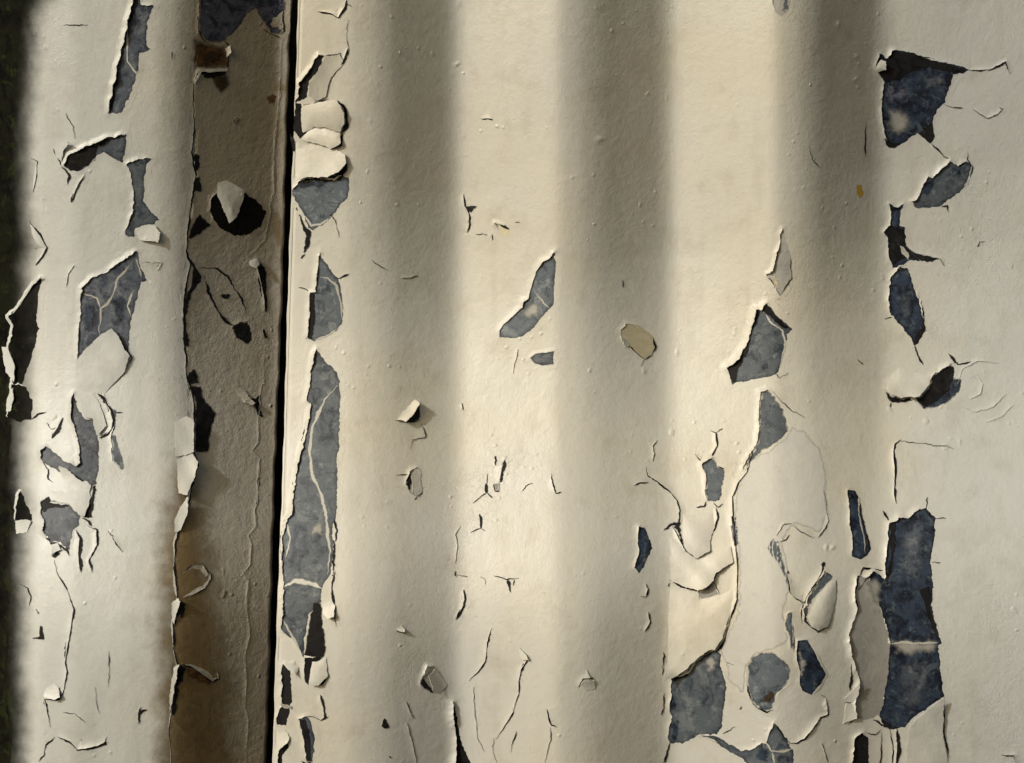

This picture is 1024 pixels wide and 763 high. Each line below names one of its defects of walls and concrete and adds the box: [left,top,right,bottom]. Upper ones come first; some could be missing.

peeling [2,0,165,558]
peeling [204,179,272,242]
peeling [272,47,355,763]
peeling [492,243,564,370]
peeling [616,319,660,364]
peeling [695,223,800,510]
peeling [870,44,1013,418]
crack [468,627,529,760]
crack [545,708,558,760]
crack [631,440,753,653]
peeling [661,483,951,763]